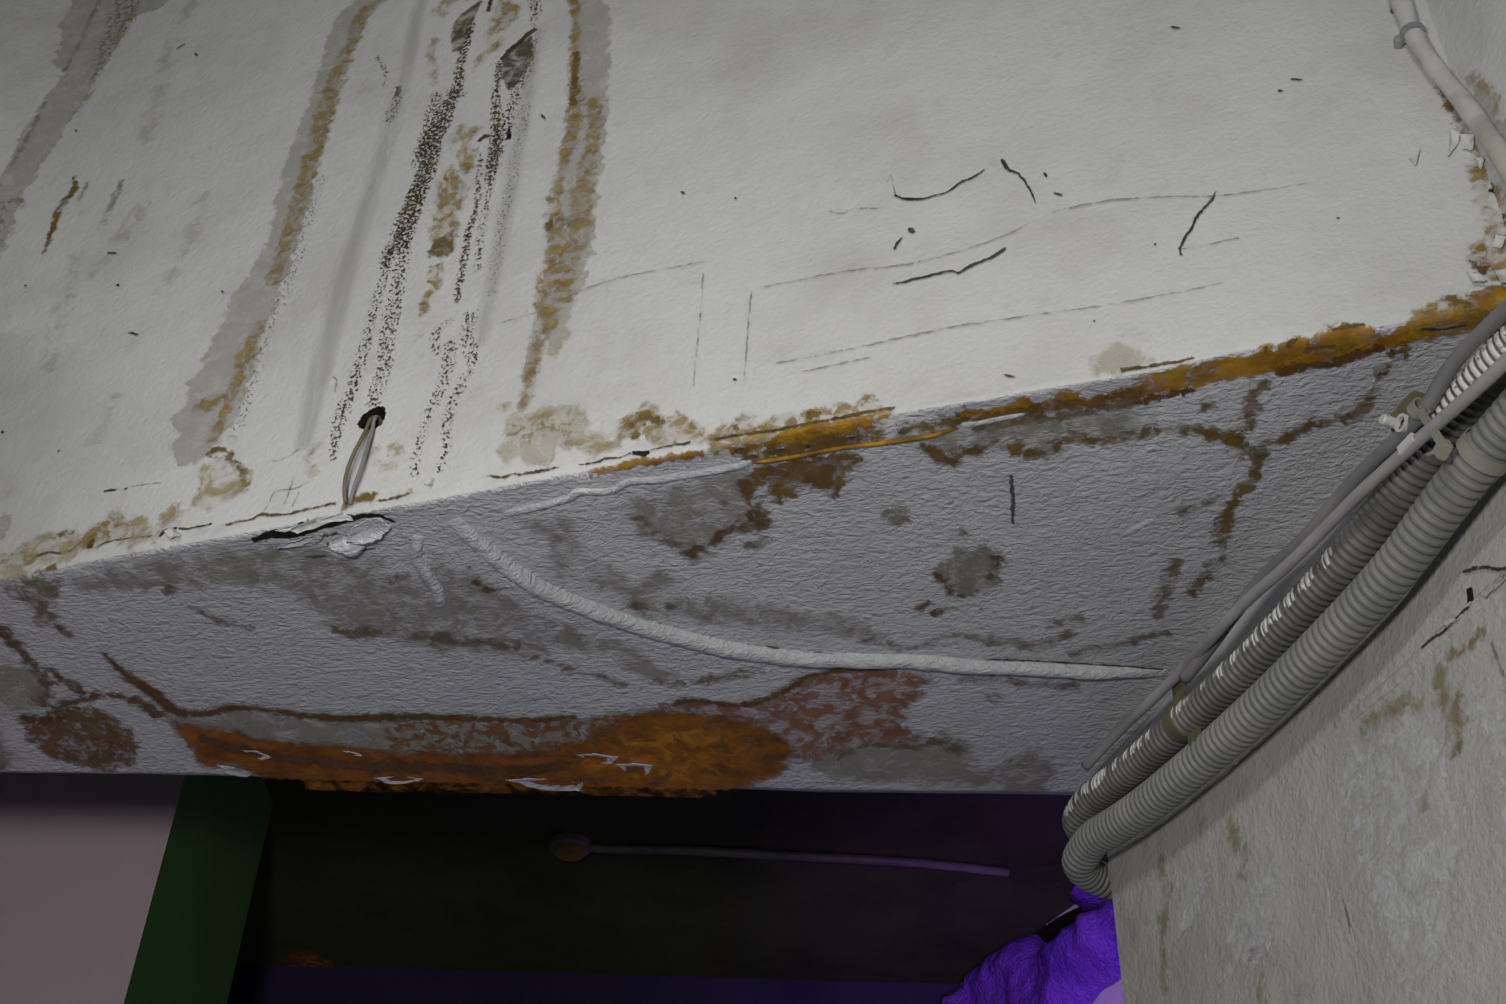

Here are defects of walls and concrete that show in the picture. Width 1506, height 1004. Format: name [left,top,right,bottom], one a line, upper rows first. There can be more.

water stain [0,0,162,240]
water stain [172,0,378,504]
water stain [310,0,541,475]
water stain [499,0,615,462]
crack [745,159,1260,372]
rust [589,90,1506,618]
peeling [251,512,396,549]
water stain [341,492,377,511]
water stain [914,530,1003,617]
rust [0,626,930,794]